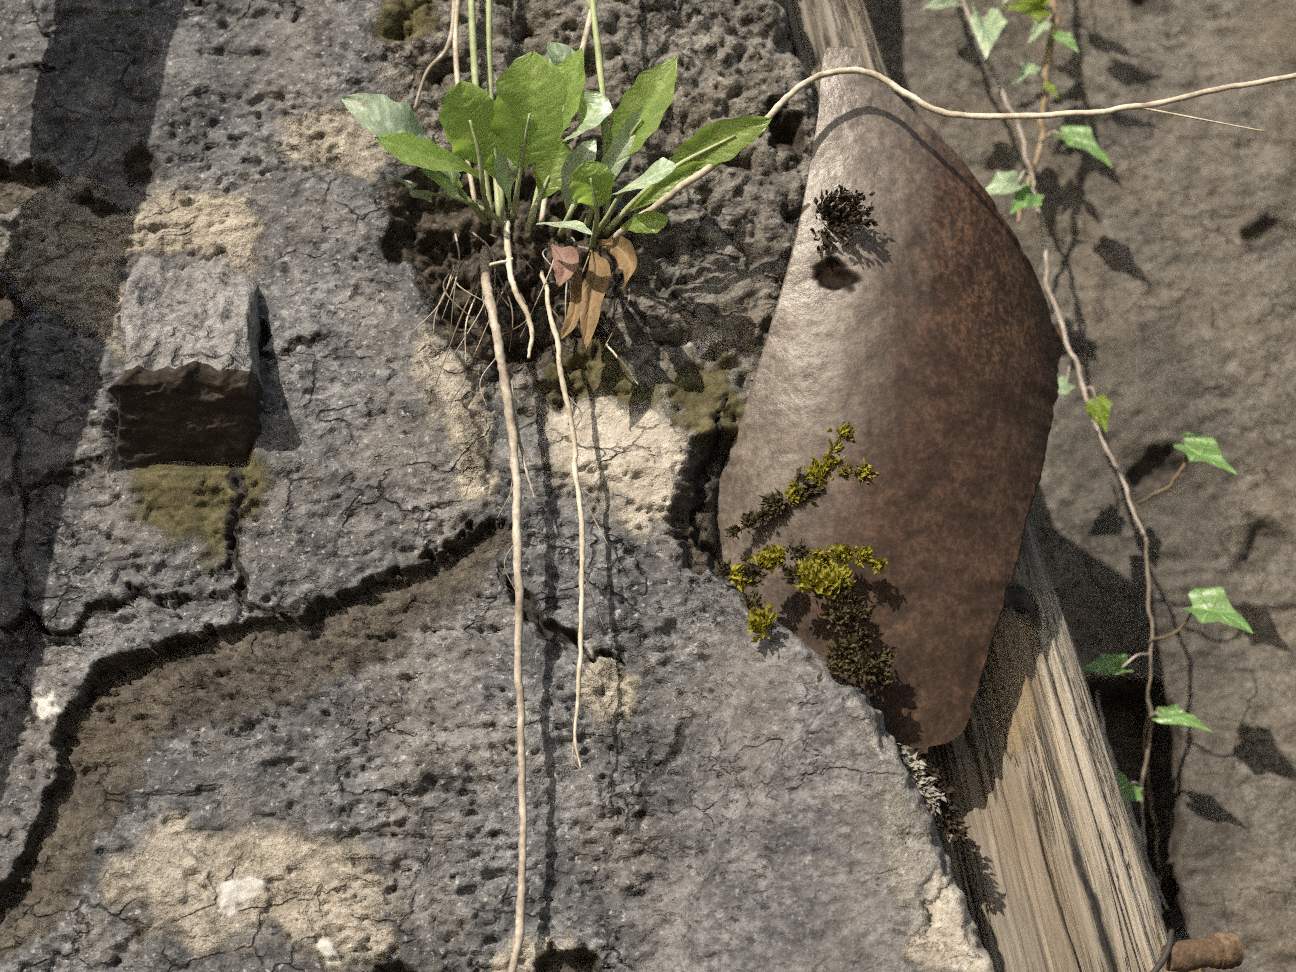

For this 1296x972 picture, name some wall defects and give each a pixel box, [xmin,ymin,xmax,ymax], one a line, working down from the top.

water stain [132,454,268,557]
spalling [0,326,513,972]
spalling [1087,678,1190,935]